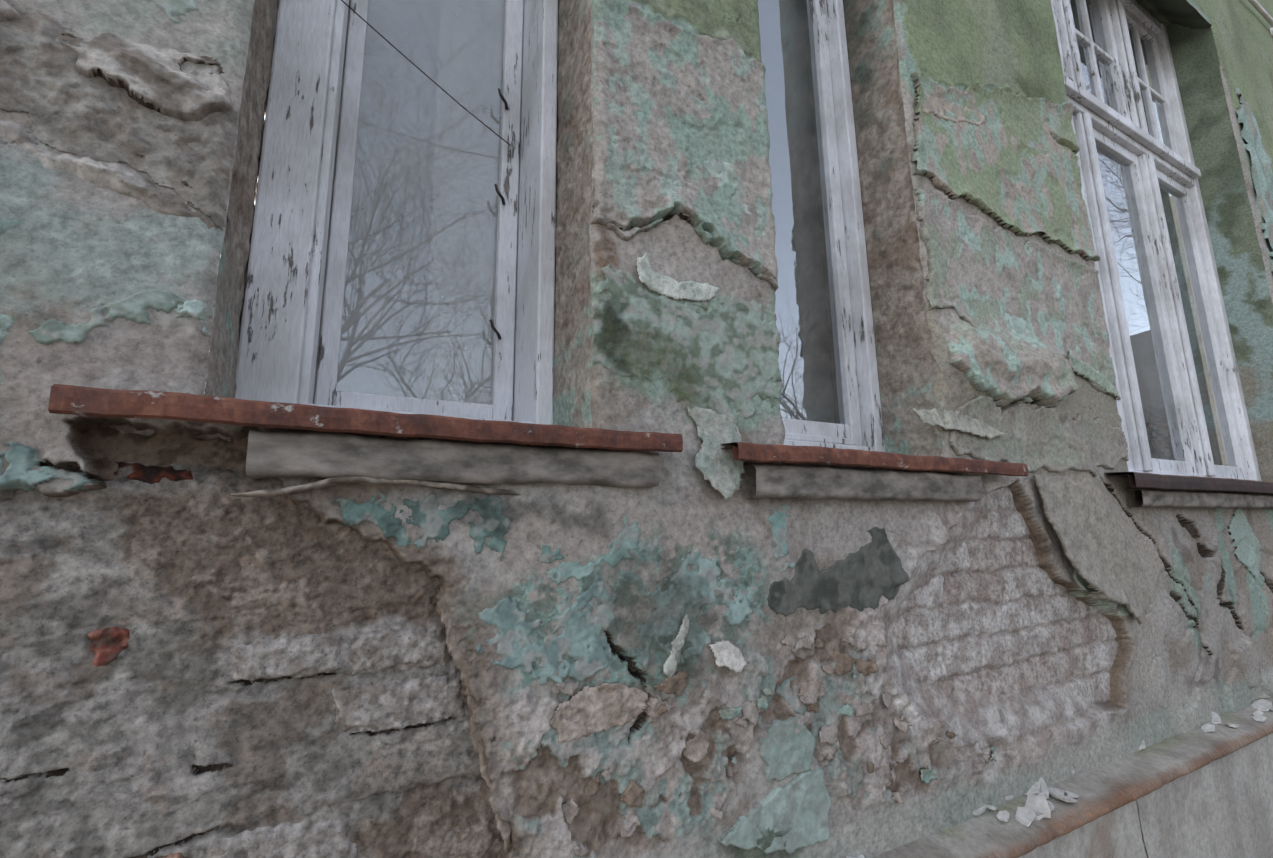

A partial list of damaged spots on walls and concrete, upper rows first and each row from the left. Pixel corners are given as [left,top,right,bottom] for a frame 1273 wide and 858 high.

peeling [29,289,213,345]
flaking render [590,0,779,291]
peeling [590,253,782,500]
flaking render [910,71,1121,402]
peeling [1234,88,1273,272]
flaking render [0,391,1151,858]
peeling [1227,508,1261,578]